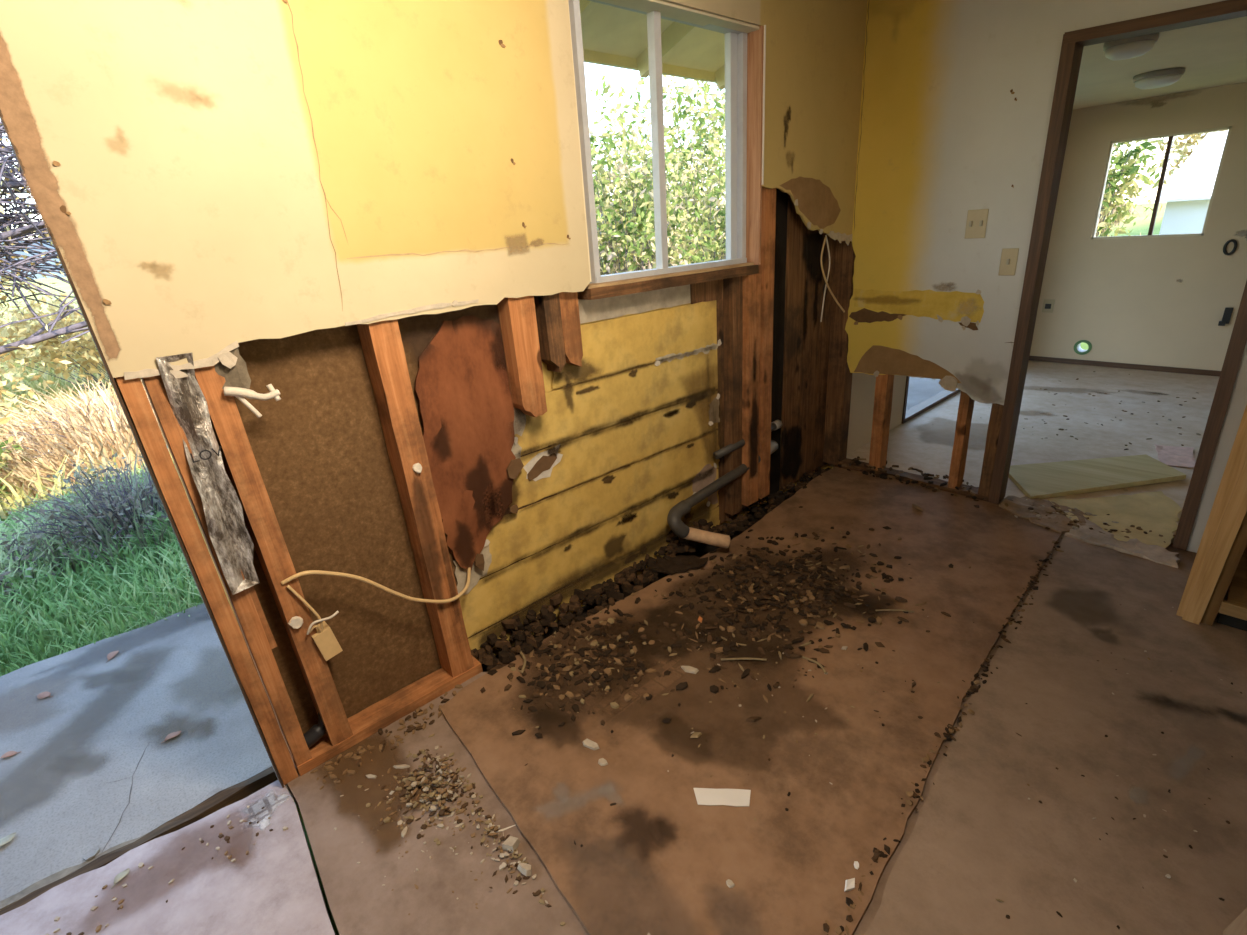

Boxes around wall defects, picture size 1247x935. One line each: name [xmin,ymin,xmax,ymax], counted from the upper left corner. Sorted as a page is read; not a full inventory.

crack [276,1,566,311]
peeling [507,225,543,254]
damp [408,307,502,352]
peeling [654,339,722,366]
peeling [854,289,984,331]
spalling [511,408,563,481]
peeling [453,539,492,595]
damp [528,552,892,740]
damp [0,611,211,824]
crack [102,742,150,852]
damp [621,809,674,856]
spalling [0,833,148,911]